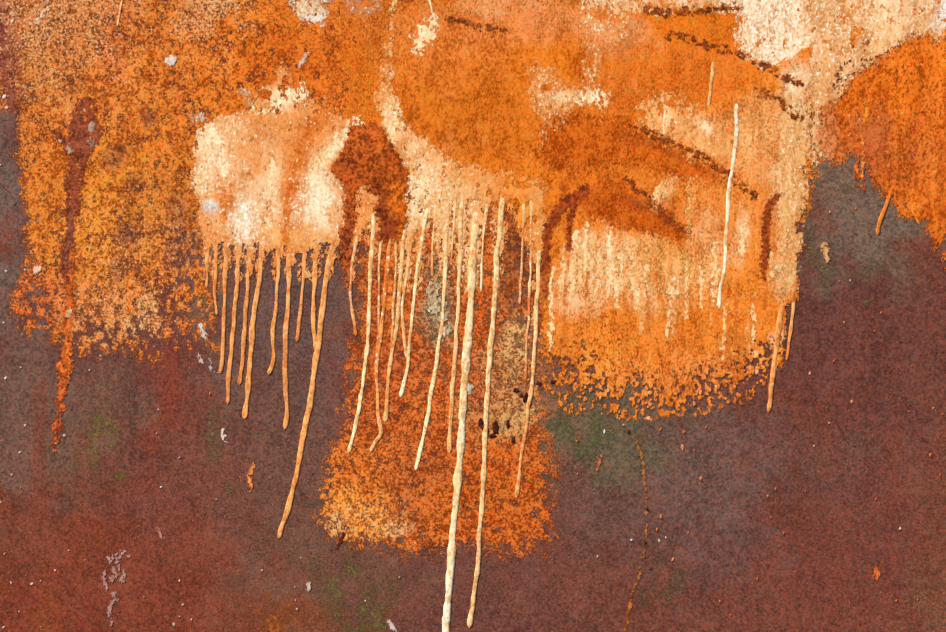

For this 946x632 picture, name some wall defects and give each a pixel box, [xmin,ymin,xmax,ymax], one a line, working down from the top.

rust [0,0,804,565]
rust [754,0,946,262]